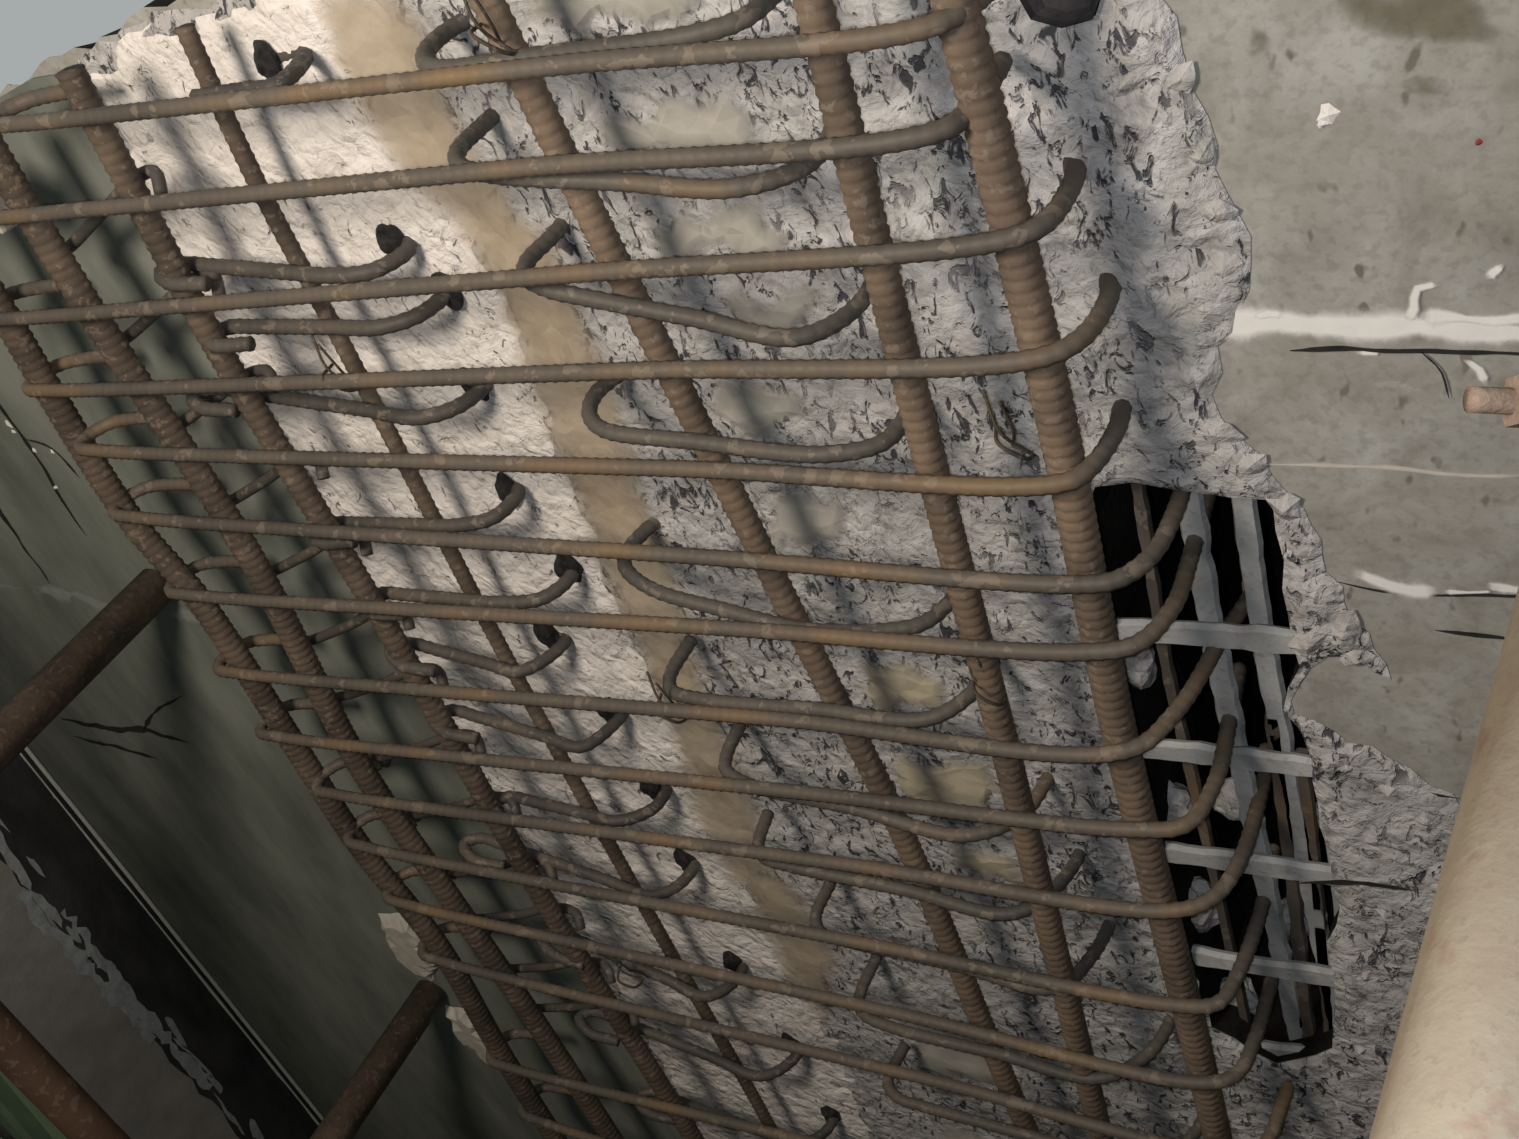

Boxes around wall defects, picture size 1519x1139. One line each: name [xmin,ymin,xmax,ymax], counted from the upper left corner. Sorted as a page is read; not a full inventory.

spalling [54,0,355,110]
rust [329,0,419,78]
damp [1349,0,1481,35]
spalling [82,97,408,198]
rust [361,89,469,169]
spalling [0,134,630,1139]
rust [425,182,828,991]
spalling [362,0,1459,1139]
crack [61,695,189,759]